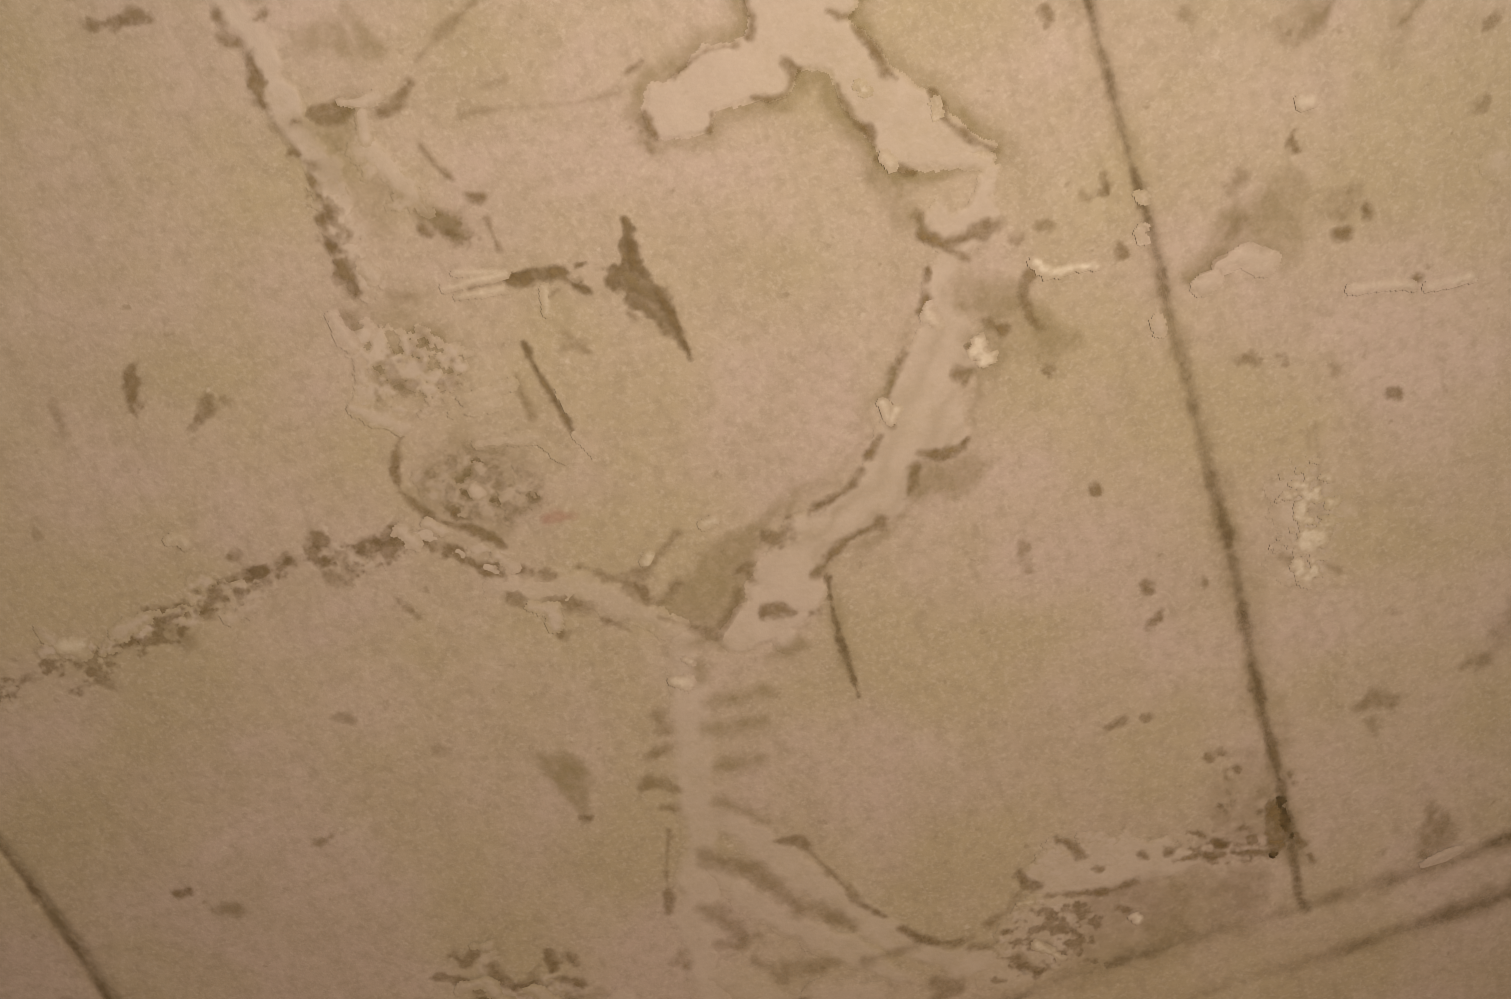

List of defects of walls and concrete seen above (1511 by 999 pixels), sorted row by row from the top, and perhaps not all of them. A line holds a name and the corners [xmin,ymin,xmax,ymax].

damp [205,0,520,437]
crack [0,448,691,714]
crack [523,342,600,459]
damp [638,0,1225,999]
damp [436,939,641,999]